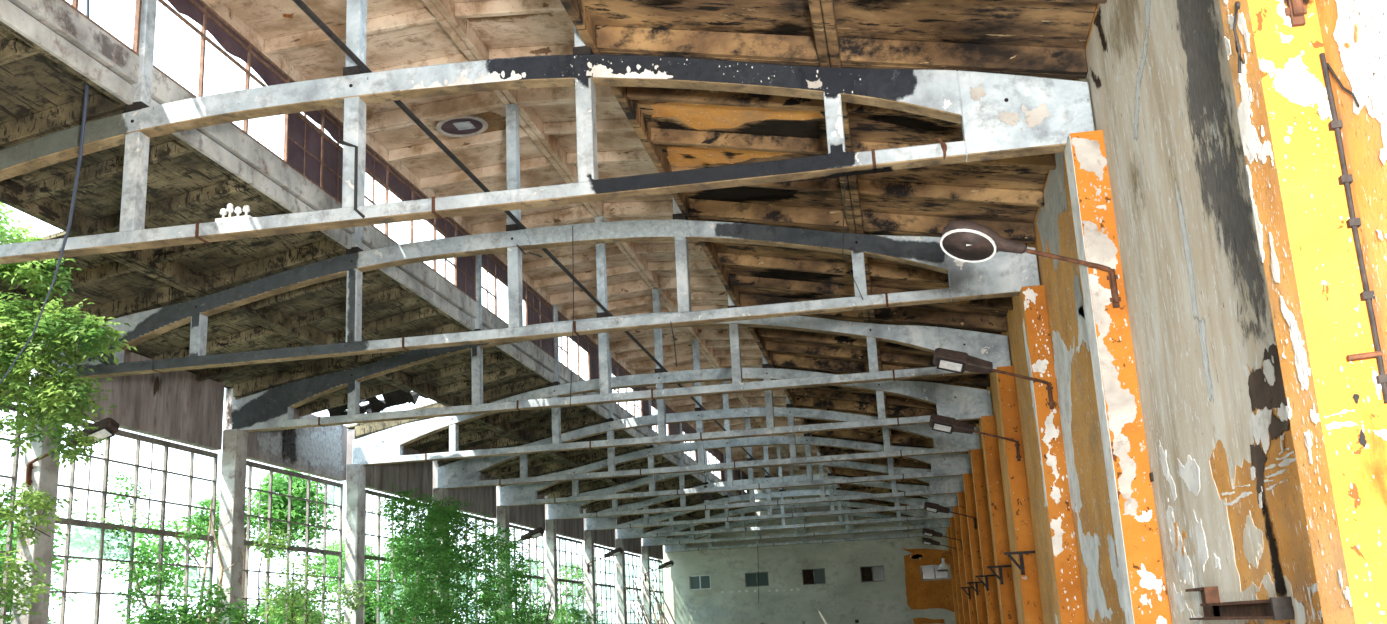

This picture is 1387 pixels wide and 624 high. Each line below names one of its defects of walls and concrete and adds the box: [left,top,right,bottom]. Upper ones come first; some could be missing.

peeling [586,62,673,79]
leakage [851,0,901,10]
leakage [1109,0,1151,140]
peeling [1333,0,1387,165]
leakage [1177,0,1275,341]
peeling [1023,0,1333,624]
leakage [1175,180,1214,402]
peeling [1338,570,1352,606]